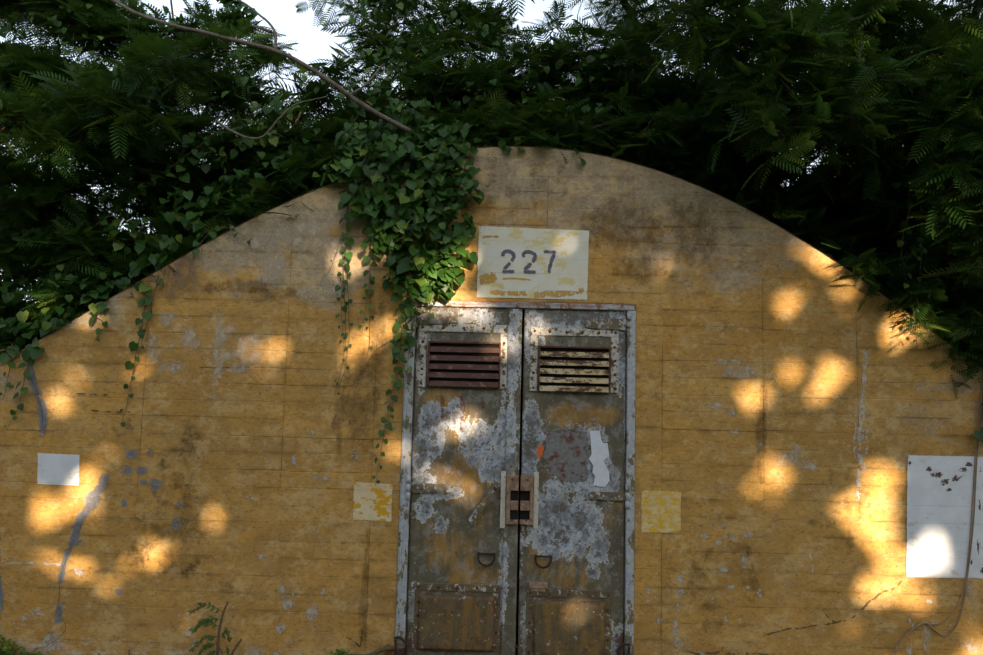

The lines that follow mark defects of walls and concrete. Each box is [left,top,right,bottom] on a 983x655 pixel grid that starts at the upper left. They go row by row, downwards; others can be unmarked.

crack [24,358,48,437]
spalling [121,448,161,491]
crack [0,576,8,617]
crack [37,473,109,649]
crack [690,580,902,655]